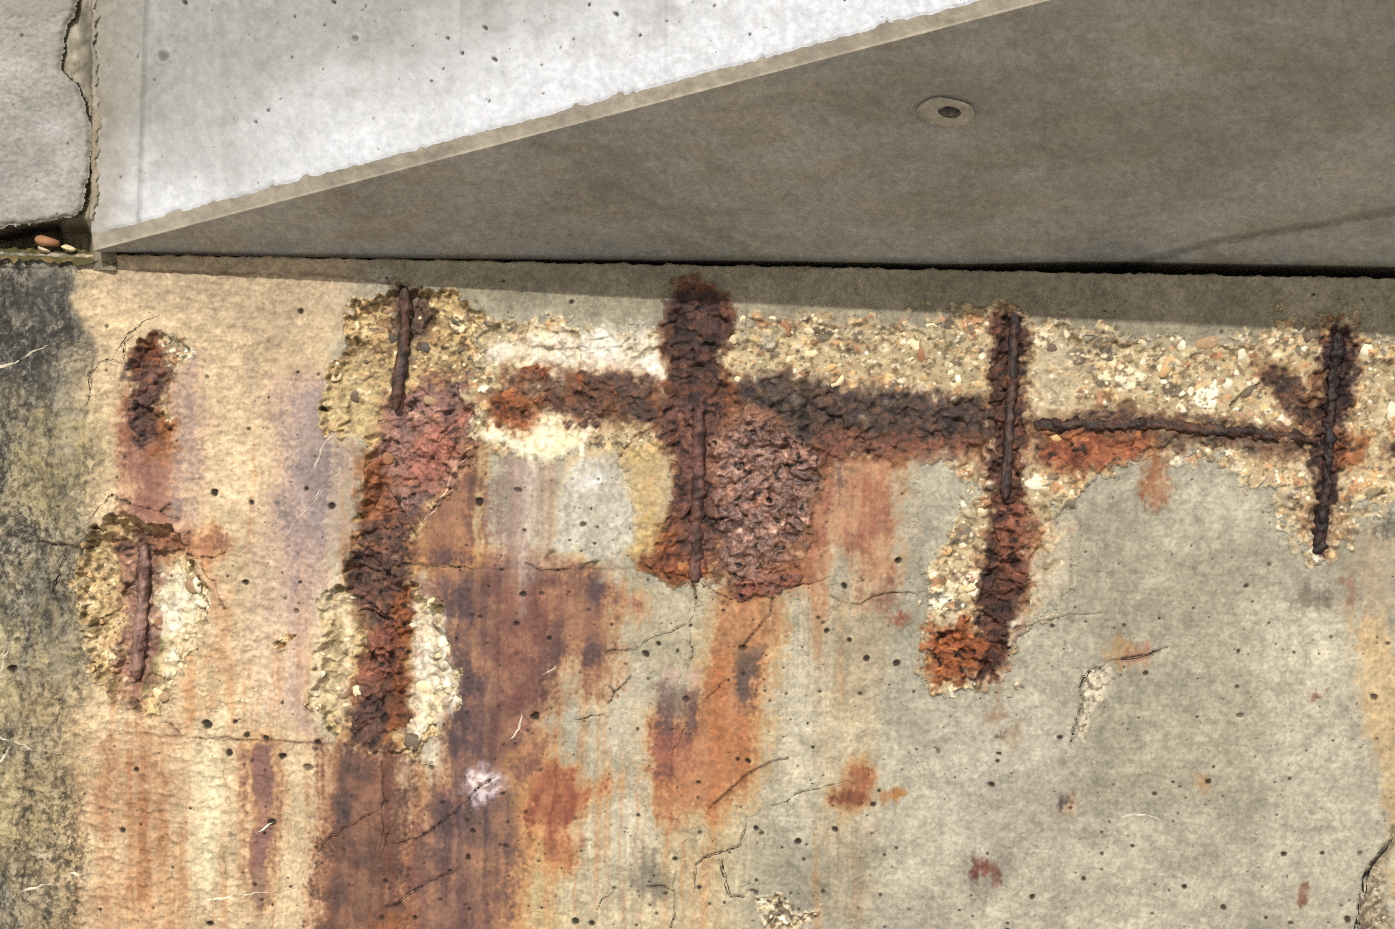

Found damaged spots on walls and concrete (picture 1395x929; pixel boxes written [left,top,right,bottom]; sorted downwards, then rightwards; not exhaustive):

spalling [303,271,1395,757]
spalling [63,511,217,718]
corrosion [51,513,245,929]
crack [506,711,524,742]
corrosion [230,442,926,929]
crack [609,566,923,659]
crack [181,761,494,913]
crack [653,759,839,928]
crack [1354,831,1393,929]